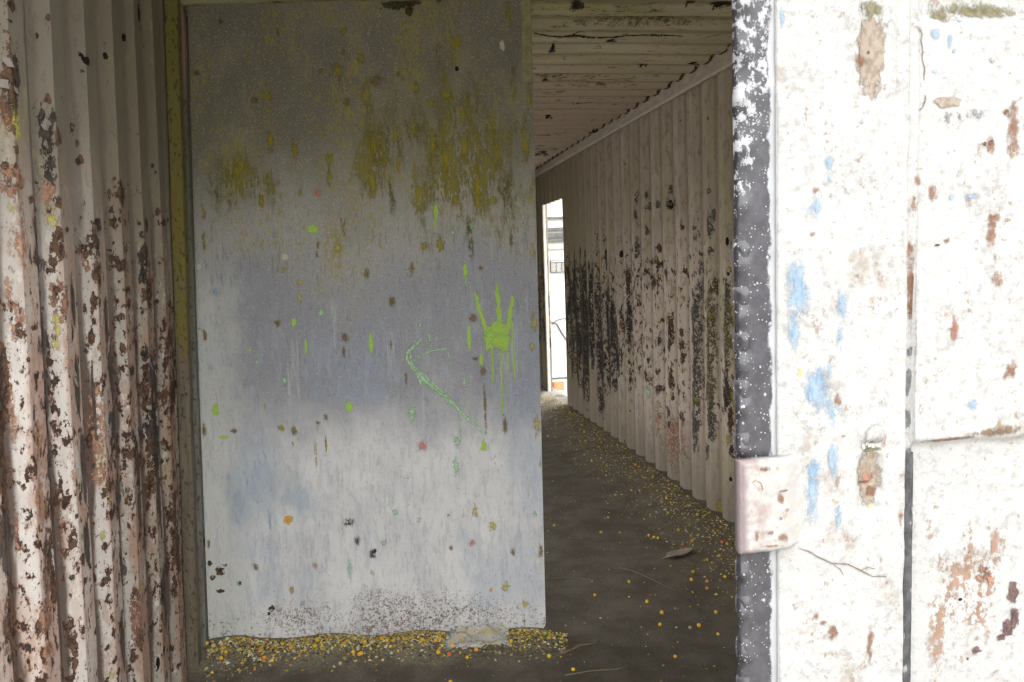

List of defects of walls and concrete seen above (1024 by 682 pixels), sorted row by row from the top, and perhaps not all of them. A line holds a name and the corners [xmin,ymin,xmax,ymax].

peeling [569,0,585,12]
peeling [855,1,888,100]
corrosion [0,0,128,324]
corrosion [1004,101,1019,157]
corrosion [83,326,102,354]
corrosion [157,326,177,417]
corrosion [0,277,85,672]
corrosion [88,385,113,501]
corrosion [122,428,142,506]
peeling [857,442,883,504]
corrosion [127,587,144,663]
corrosion [928,527,1005,662]